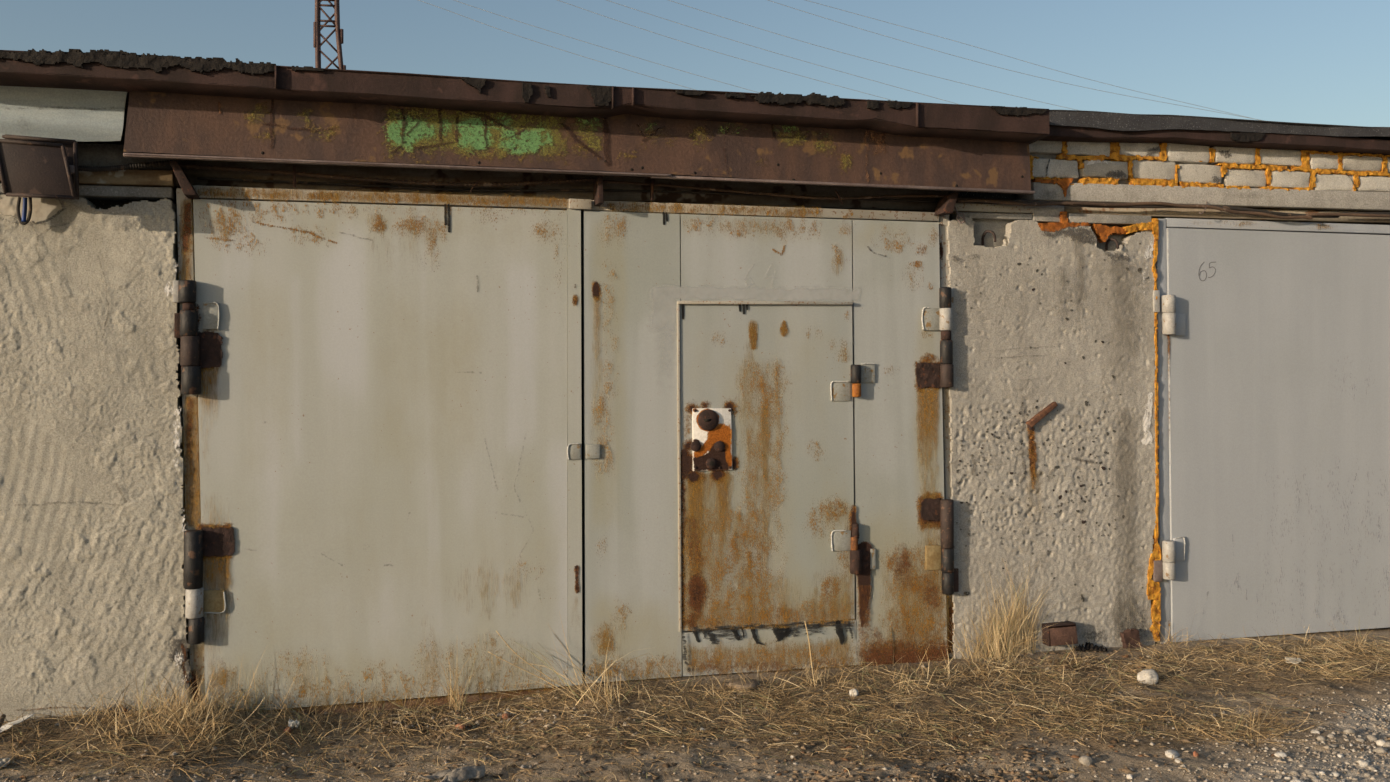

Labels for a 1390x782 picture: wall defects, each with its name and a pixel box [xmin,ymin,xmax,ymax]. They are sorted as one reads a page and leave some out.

corrosion [180,187,619,474]
spalling [1042,226,1149,279]
corrosion [184,367,231,530]
corrosion [586,321,954,683]
corrosion [1027,427,1037,489]
spalling [956,375,1133,569]